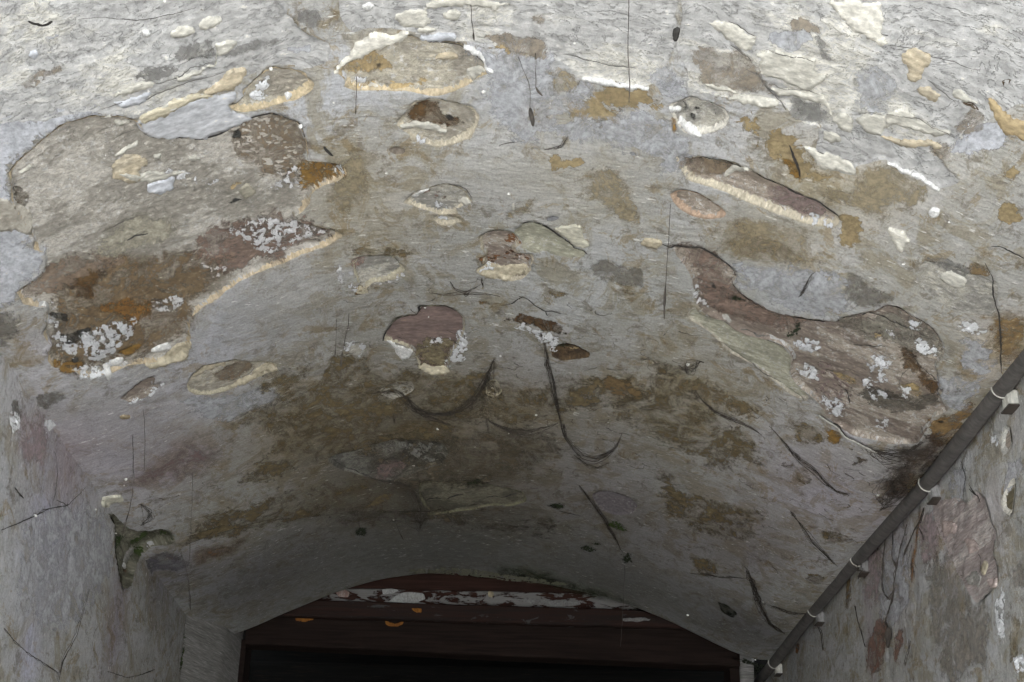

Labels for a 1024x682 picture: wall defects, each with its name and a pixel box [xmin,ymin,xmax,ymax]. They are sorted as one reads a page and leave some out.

flaking render [0,0,1024,444]
flaking render [101,495,175,589]
water stain [186,355,764,563]